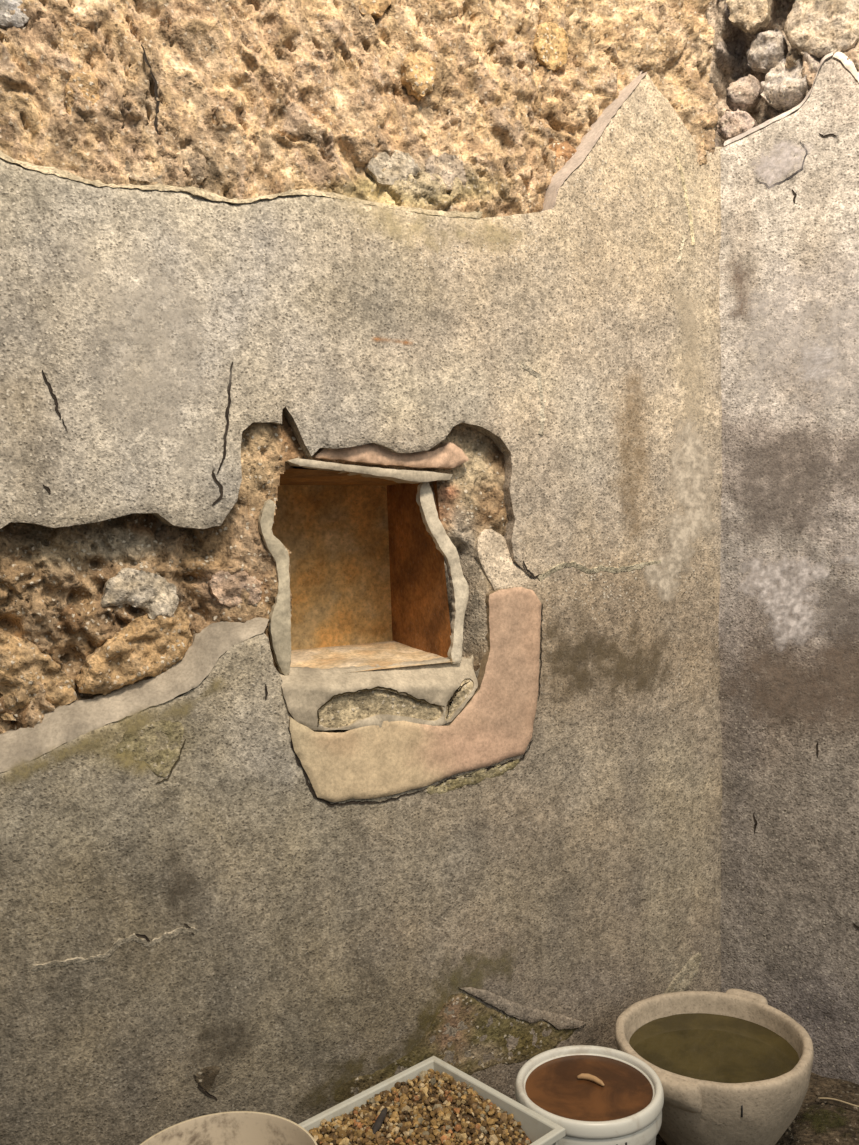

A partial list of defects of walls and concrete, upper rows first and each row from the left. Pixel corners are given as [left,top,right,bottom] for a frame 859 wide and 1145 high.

crack [141,44,160,144]
flaking render [0,0,859,219]
peeling [675,155,695,263]
crack [42,370,68,432]
crack [212,361,233,505]
flaking render [0,410,661,783]
water stain [740,558,859,720]
flaking render [425,759,520,795]